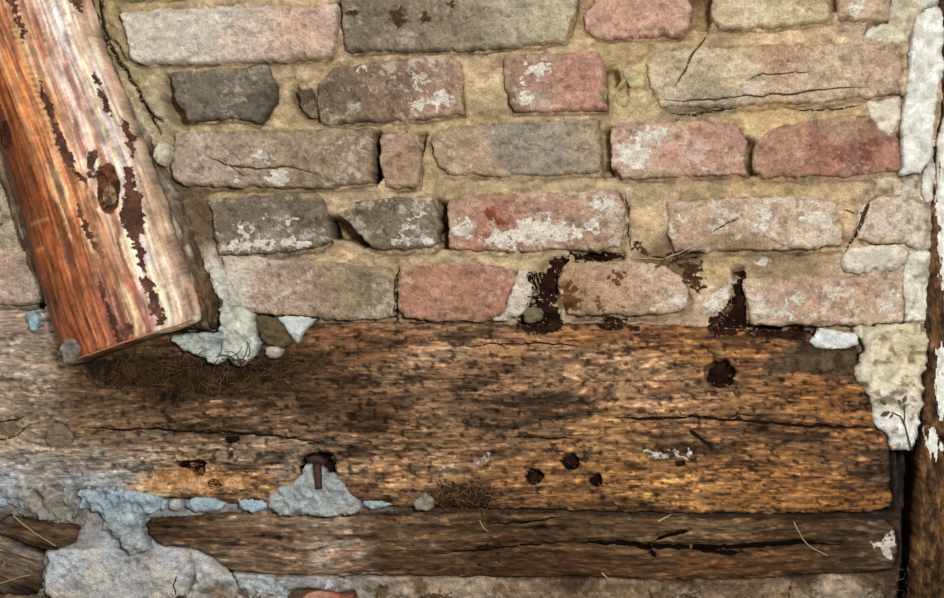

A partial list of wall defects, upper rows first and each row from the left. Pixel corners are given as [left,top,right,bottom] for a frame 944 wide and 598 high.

crack [99,0,161,135]
damp [518,56,552,106]
crack [662,29,869,117]
damp [611,123,668,170]
peeling [809,0,944,461]
damp [450,194,625,336]
rust [607,269,627,286]
rust [559,280,640,332]
crack [604,413,873,449]
crack [433,517,840,557]